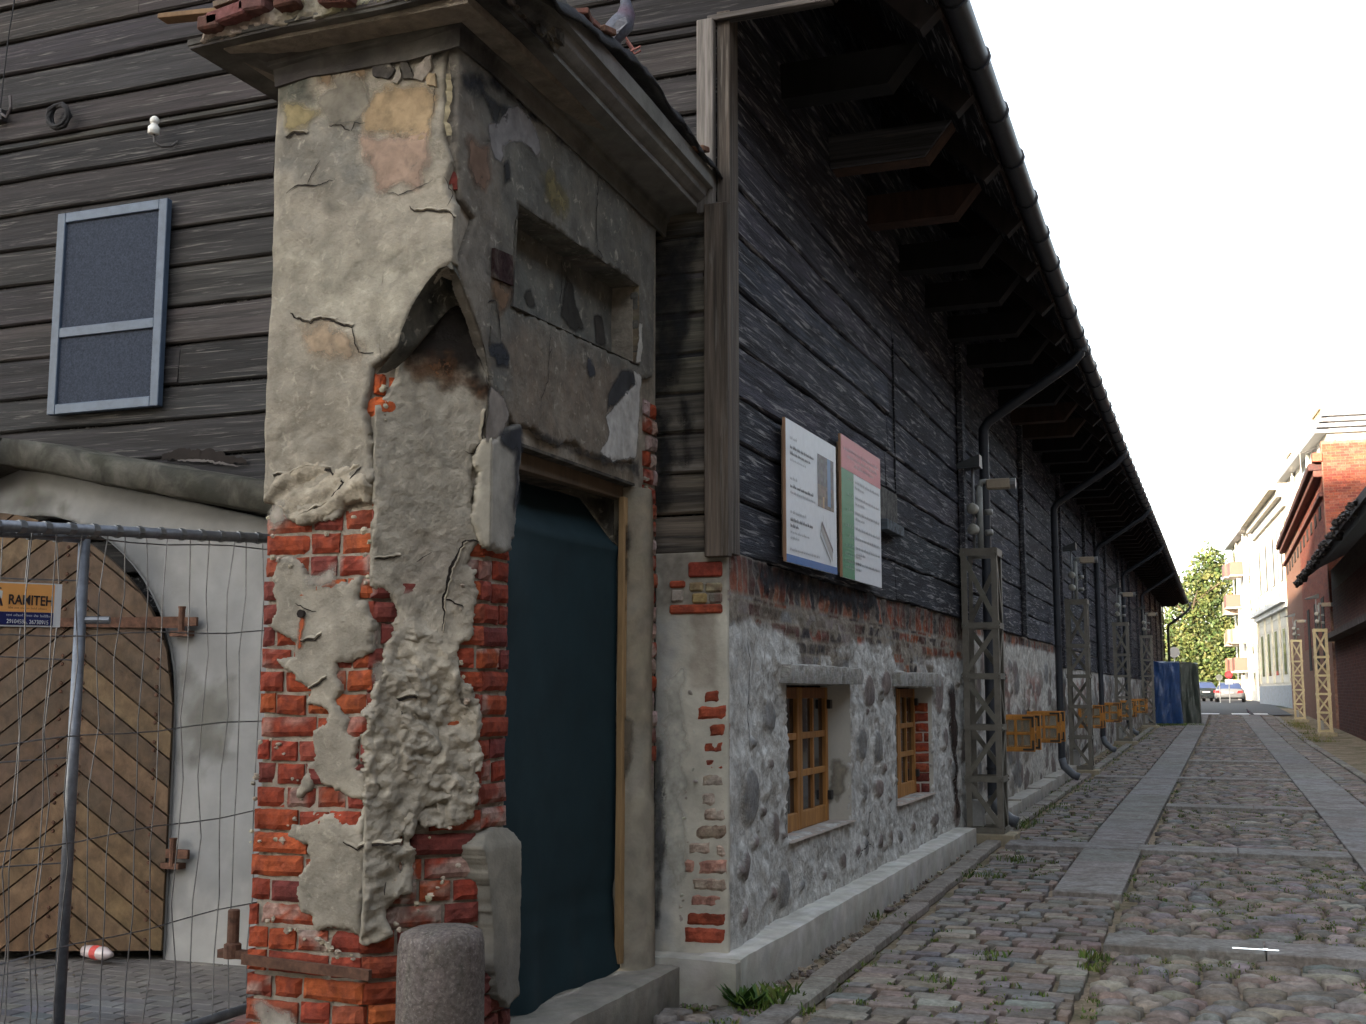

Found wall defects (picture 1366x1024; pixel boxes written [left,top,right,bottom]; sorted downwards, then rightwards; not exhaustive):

crack [285,122,364,191]
flaking render [488,106,540,162]
crack [291,313,374,354]
crack [374,539,479,632]
flaking render [246,504,511,1024]
flaking render [679,690,727,943]